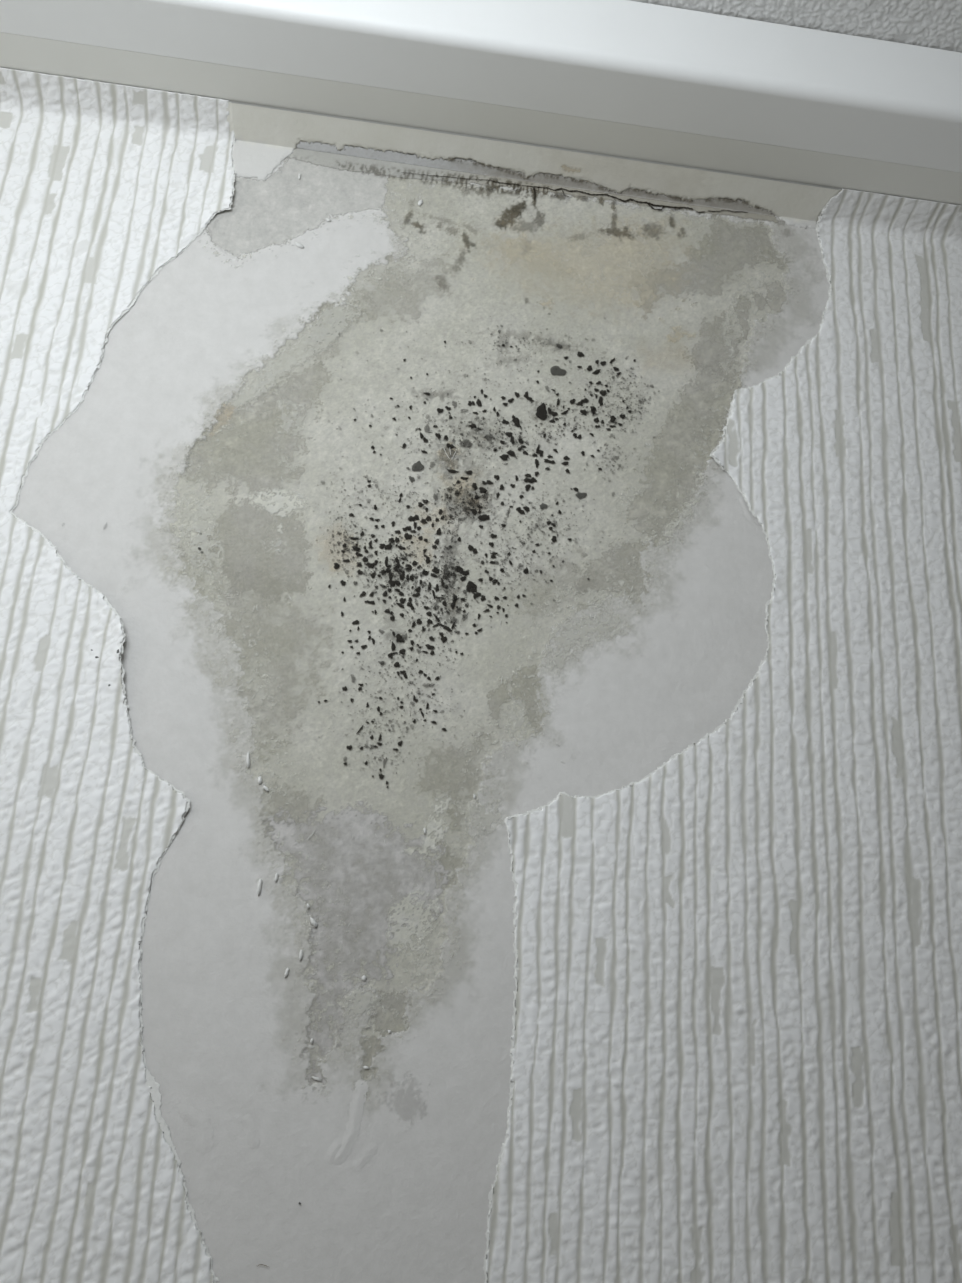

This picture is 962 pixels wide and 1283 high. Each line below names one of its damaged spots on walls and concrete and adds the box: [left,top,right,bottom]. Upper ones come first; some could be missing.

peeling [12,141,830,1283]
leakage [162,158,790,1094]